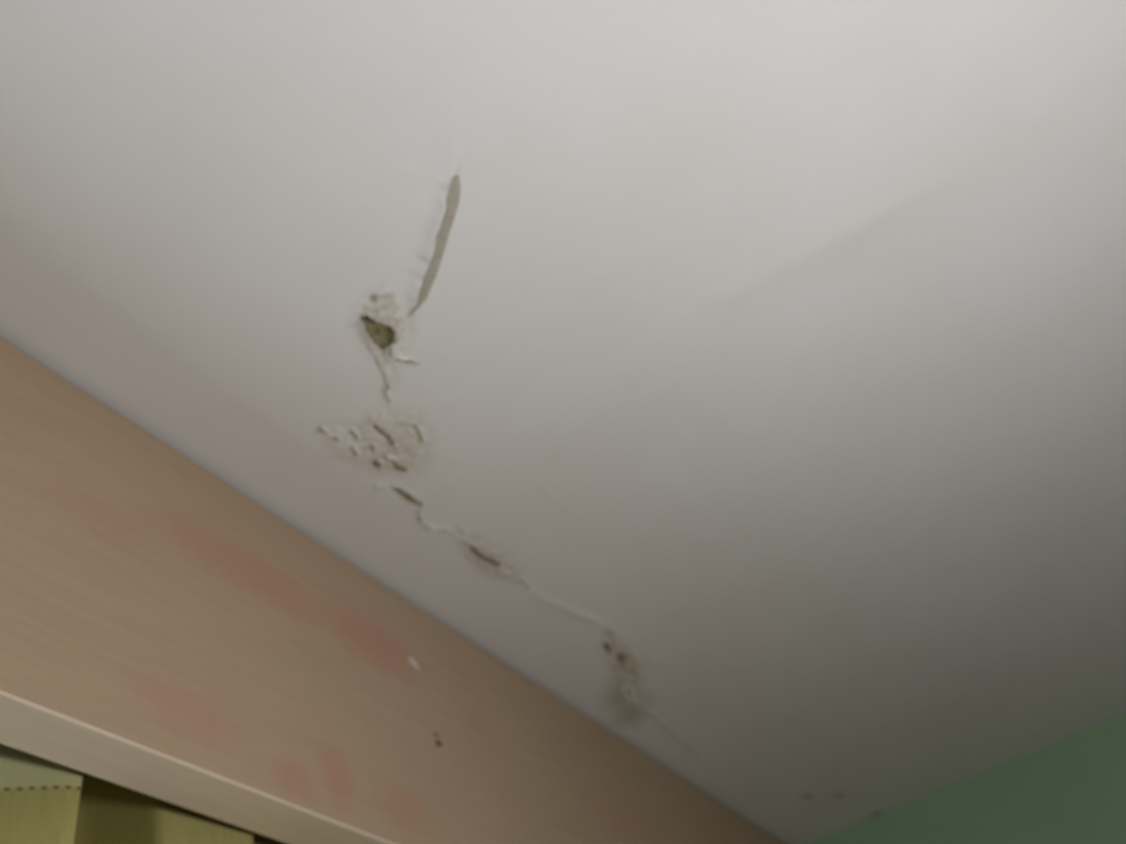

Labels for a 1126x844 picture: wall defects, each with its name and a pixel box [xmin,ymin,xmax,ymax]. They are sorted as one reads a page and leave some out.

peeling [314,169,460,479]
crack [371,482,612,633]